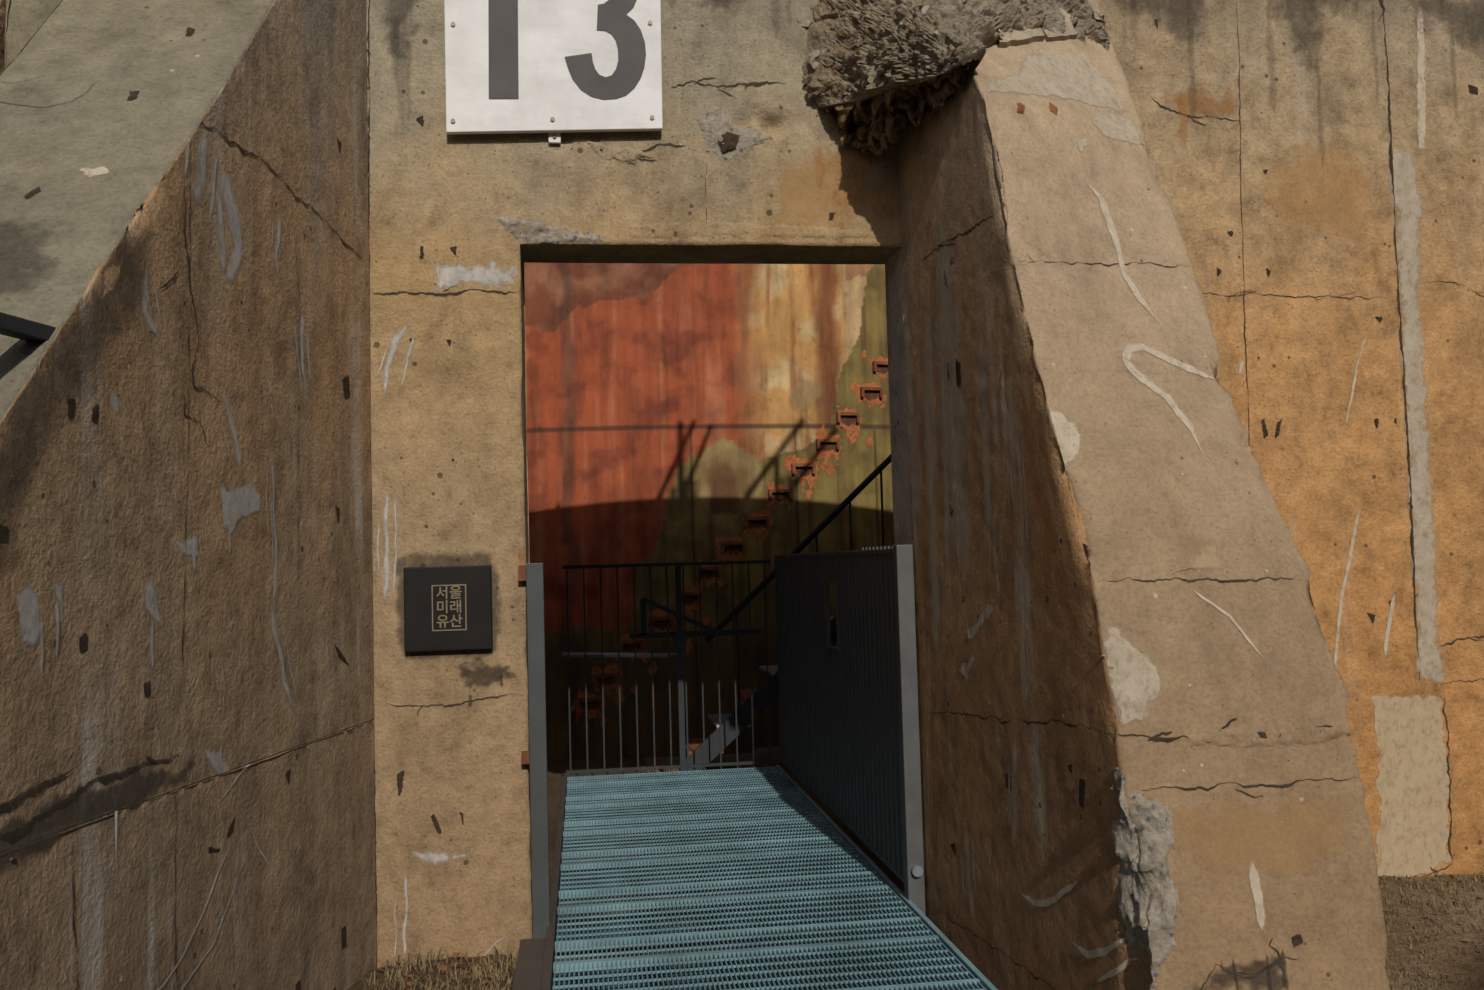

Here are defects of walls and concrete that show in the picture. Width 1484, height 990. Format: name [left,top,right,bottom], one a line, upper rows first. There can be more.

crack [674,77,786,96]
spalling [798,0,1145,155]
peeling [437,261,516,289]
crack [0,0,523,990]
crack [1142,0,1484,877]
peeling [1371,8,1451,877]
peeling [206,746,229,774]
crack [922,710,1281,743]
spalling [1102,627,1161,725]
spalling [1110,767,1179,990]